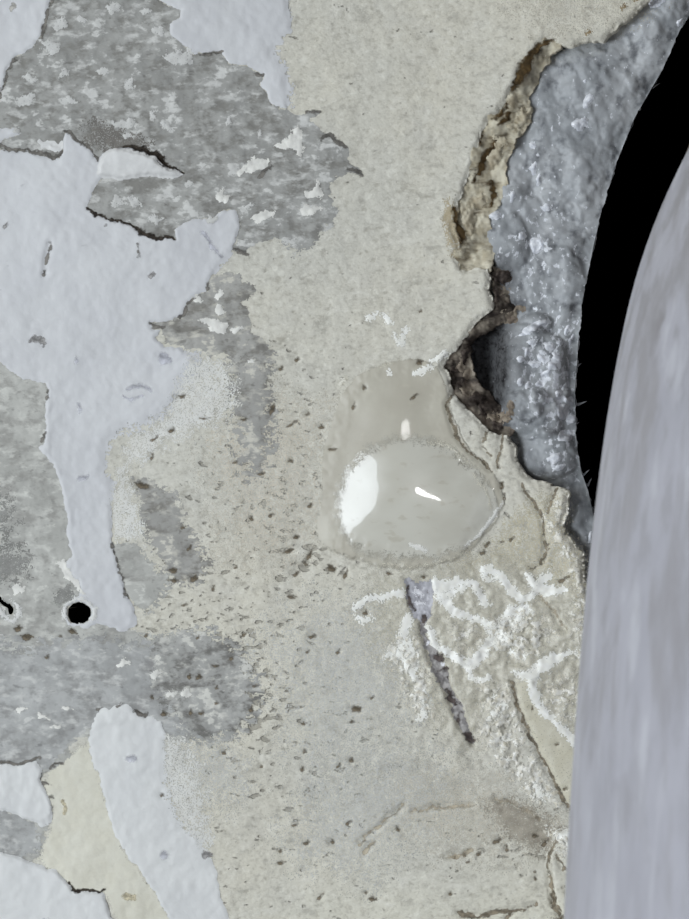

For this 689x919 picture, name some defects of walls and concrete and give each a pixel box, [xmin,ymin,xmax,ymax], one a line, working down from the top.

peeling [0,0,363,919]
damp [186,378,589,903]
crack [449,849,473,859]
crack [457,838,566,919]
crack [510,681,570,810]
spalling [444,0,689,576]